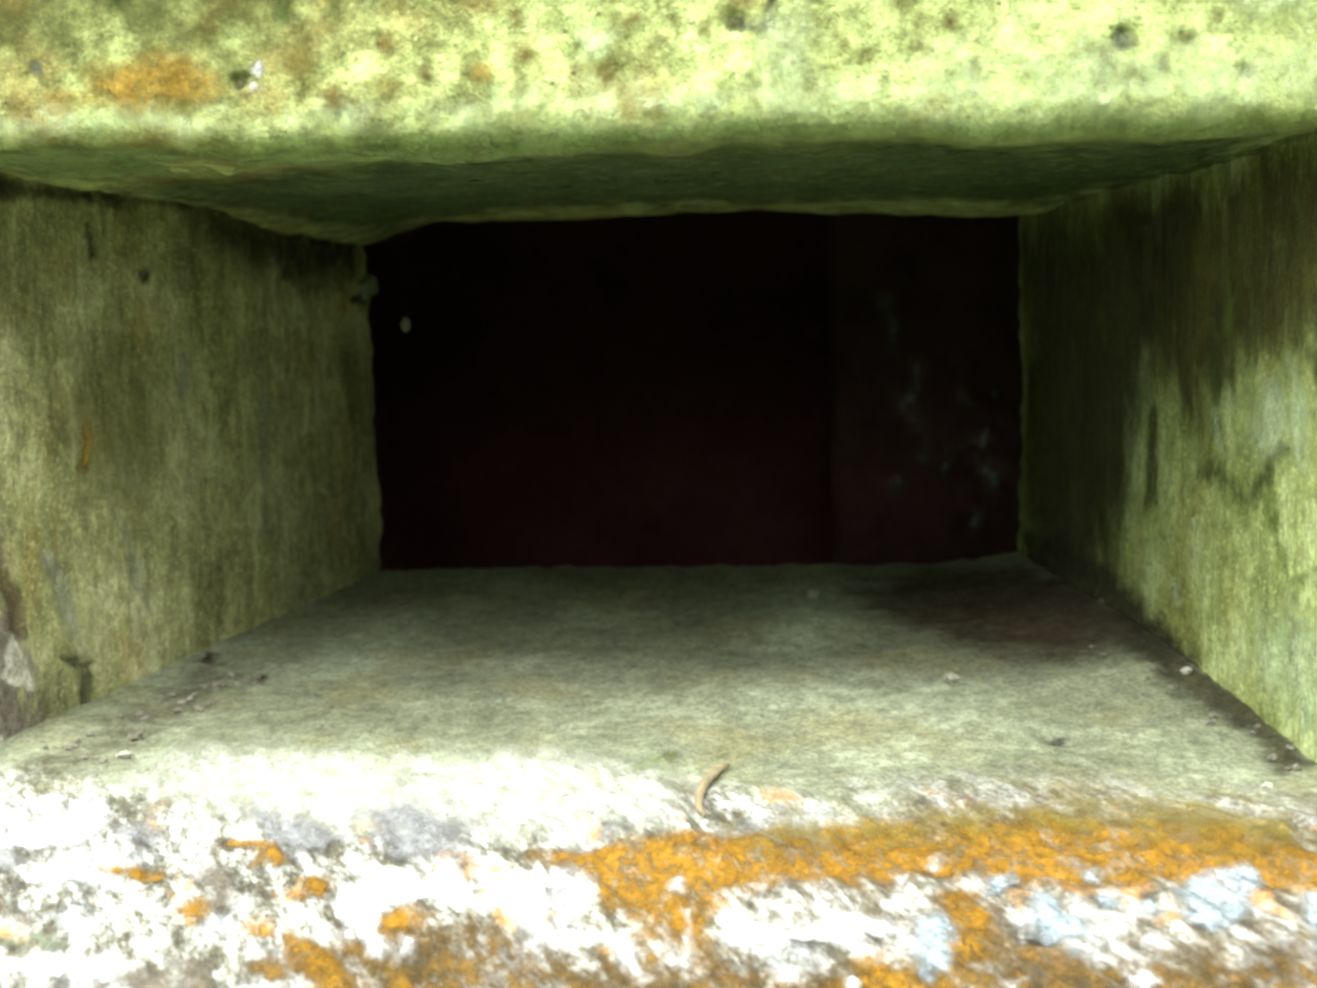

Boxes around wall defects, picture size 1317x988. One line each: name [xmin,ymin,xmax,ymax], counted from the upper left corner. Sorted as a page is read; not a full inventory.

crack [764,0,775,31]
leakage [1022,146,1317,663]
leakage [1265,630,1317,729]